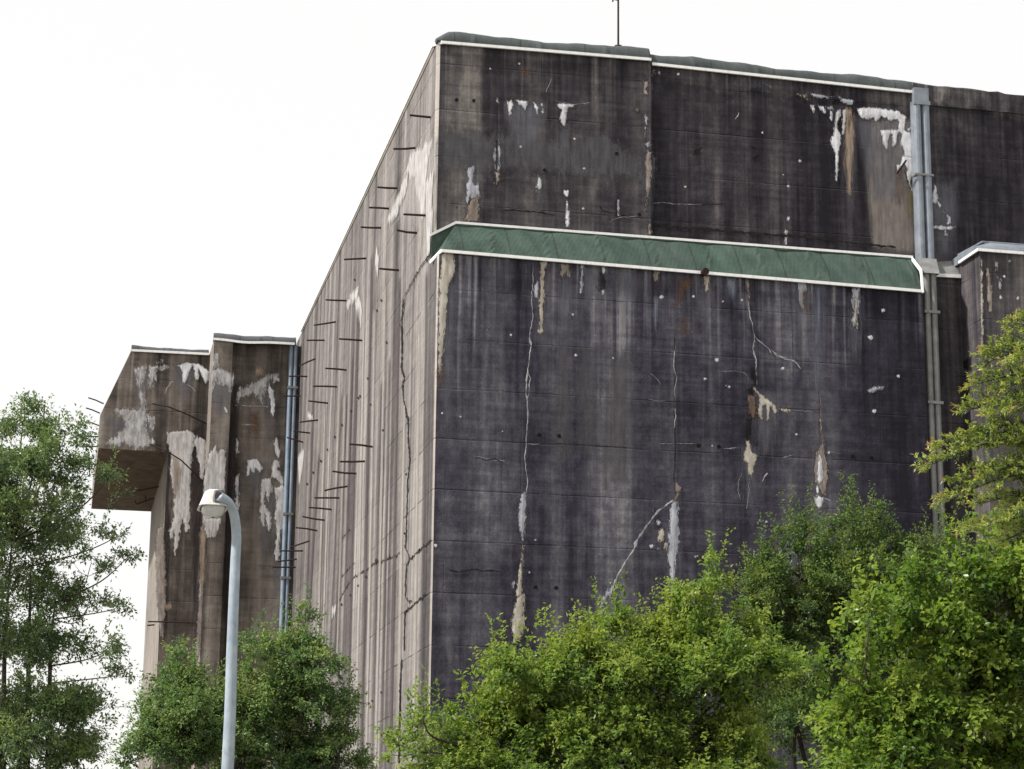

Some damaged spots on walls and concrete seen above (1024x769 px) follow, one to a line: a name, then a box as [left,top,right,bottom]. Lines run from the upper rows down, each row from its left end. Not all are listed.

peeling [496,98,544,115]
peeling [557,101,585,127]
peeling [463,165,481,222]
leakage [868,120,914,253]
crack [725,279,801,381]
peeling [106,353,284,662]
crack [332,251,431,763]
leakage [308,269,457,767]
crack [450,262,533,644]
crack [599,338,694,614]
spalling [738,367,814,509]
spalling [812,443,842,508]